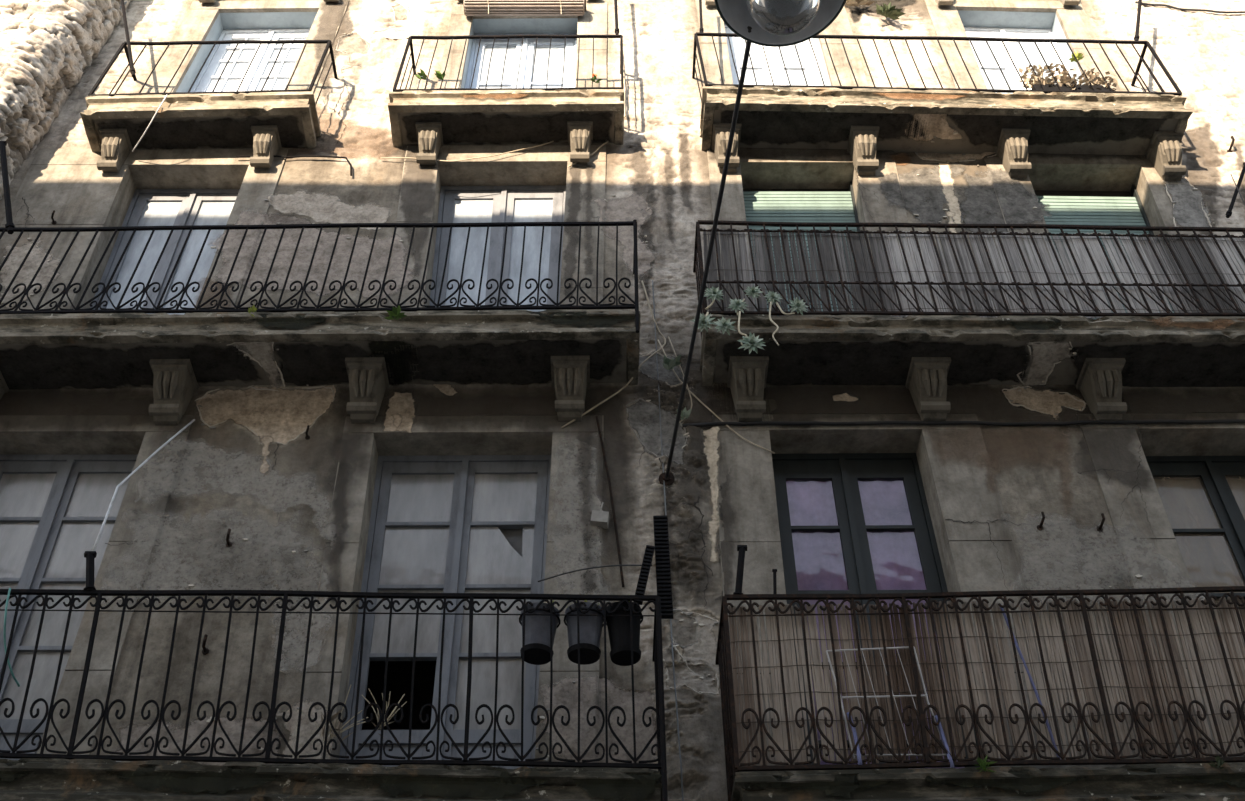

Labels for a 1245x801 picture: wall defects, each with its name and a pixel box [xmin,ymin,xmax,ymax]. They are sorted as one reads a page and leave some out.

water stain [97,0,612,275]
water stain [564,165,593,298]
water stain [628,134,691,299]
spalling [195,342,336,473]
spalling [1002,342,1087,420]